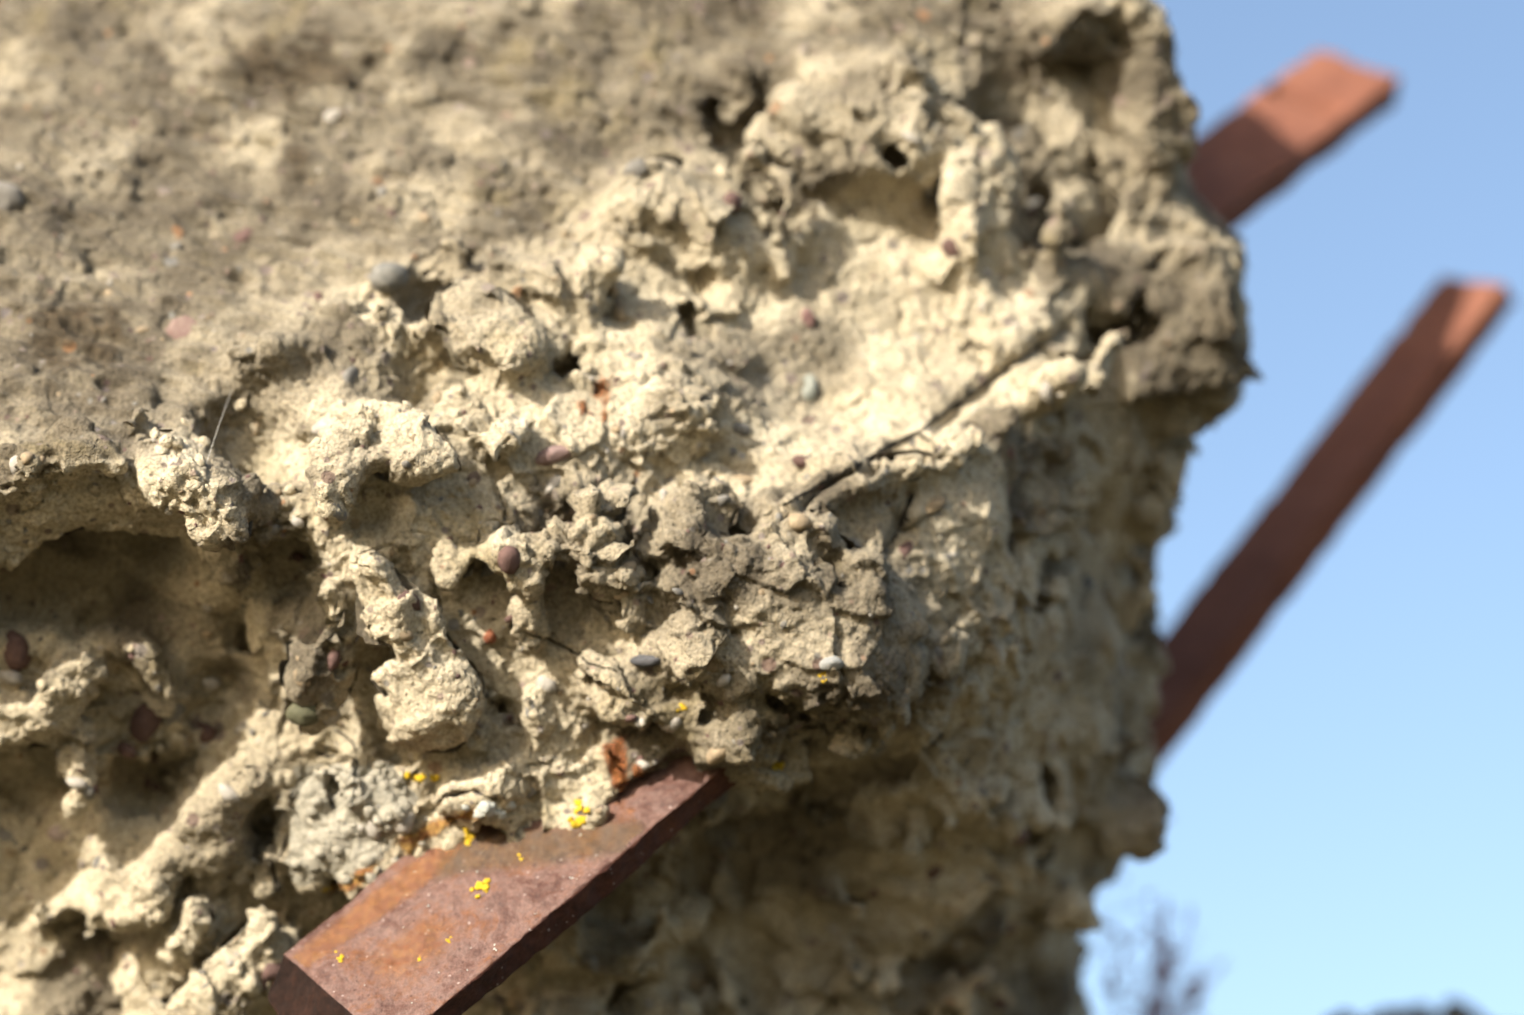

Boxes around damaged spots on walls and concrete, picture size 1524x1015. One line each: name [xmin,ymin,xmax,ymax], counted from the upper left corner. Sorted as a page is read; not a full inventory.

spalling [690,86,835,246]
spalling [987,90,1068,273]
spalling [402,267,478,421]
spalling [0,380,299,806]
spalling [315,486,445,564]
spalling [0,755,81,907]
spalling [285,753,419,887]
rust [328,863,378,894]
rust [399,807,479,855]
spalling [795,739,926,801]